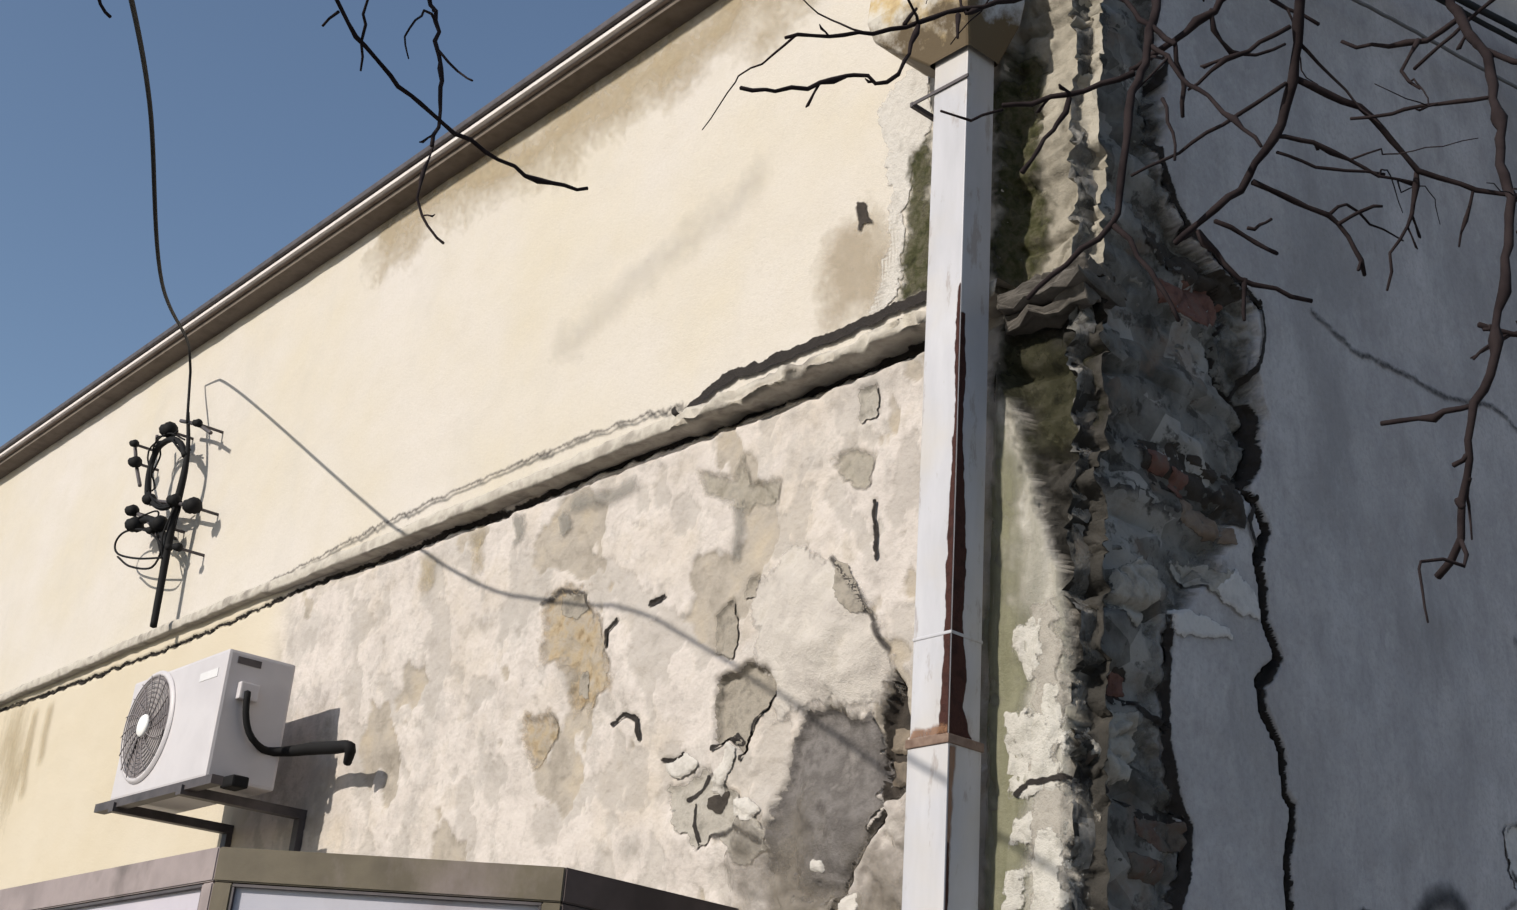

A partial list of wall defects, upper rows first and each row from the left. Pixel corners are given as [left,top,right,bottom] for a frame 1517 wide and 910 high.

spalling [700,458,781,560]
spalling [836,450,874,489]
spalling [858,384,879,423]
spalling [1001,0,1250,910]
crack [1137,61,1296,910]
crack [1312,312,1517,429]
spalling [540,588,610,710]
rust [909,282,972,910]
spalling [524,715,560,768]
spalling [666,574,911,910]
spalling [1503,826,1517,910]